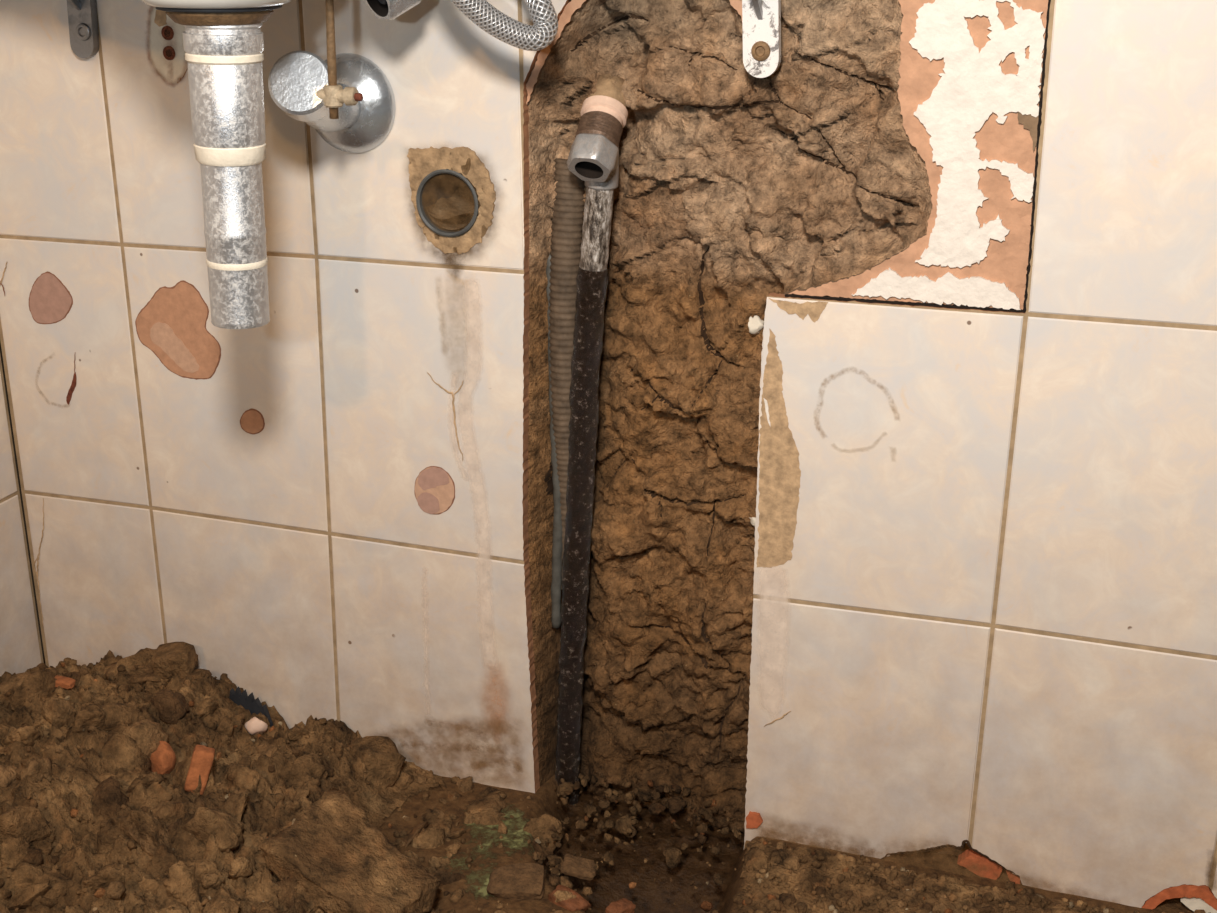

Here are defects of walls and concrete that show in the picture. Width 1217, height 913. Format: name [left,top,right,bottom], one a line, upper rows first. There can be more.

crack [570,13,648,52]
crack [669,46,738,70]
crack [794,50,895,101]
crack [637,82,913,206]
crack [630,247,735,452]
spalling [526,0,1051,833]
crack [544,462,553,495]
crack [644,489,744,562]
crack [632,604,745,757]